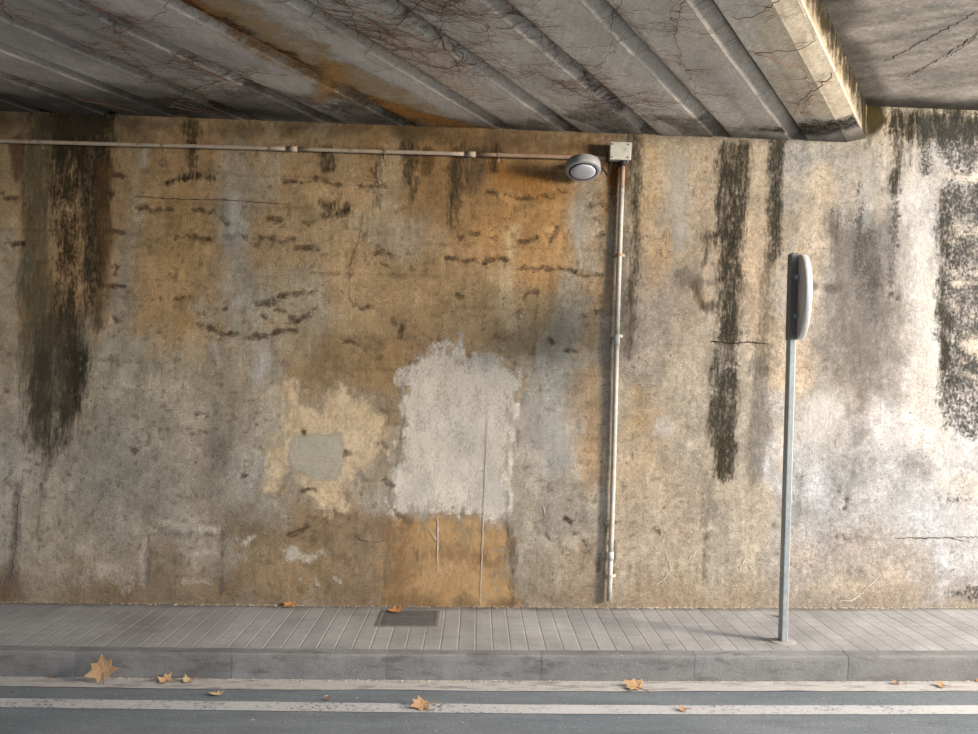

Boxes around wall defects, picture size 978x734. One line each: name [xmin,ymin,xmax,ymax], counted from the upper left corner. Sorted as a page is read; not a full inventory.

damp [160,82,330,185]
damp [760,127,786,279]
damp [798,0,866,136]
crack [883,14,978,77]
damp [13,109,115,458]
damp [677,134,750,483]
damp [836,108,978,501]